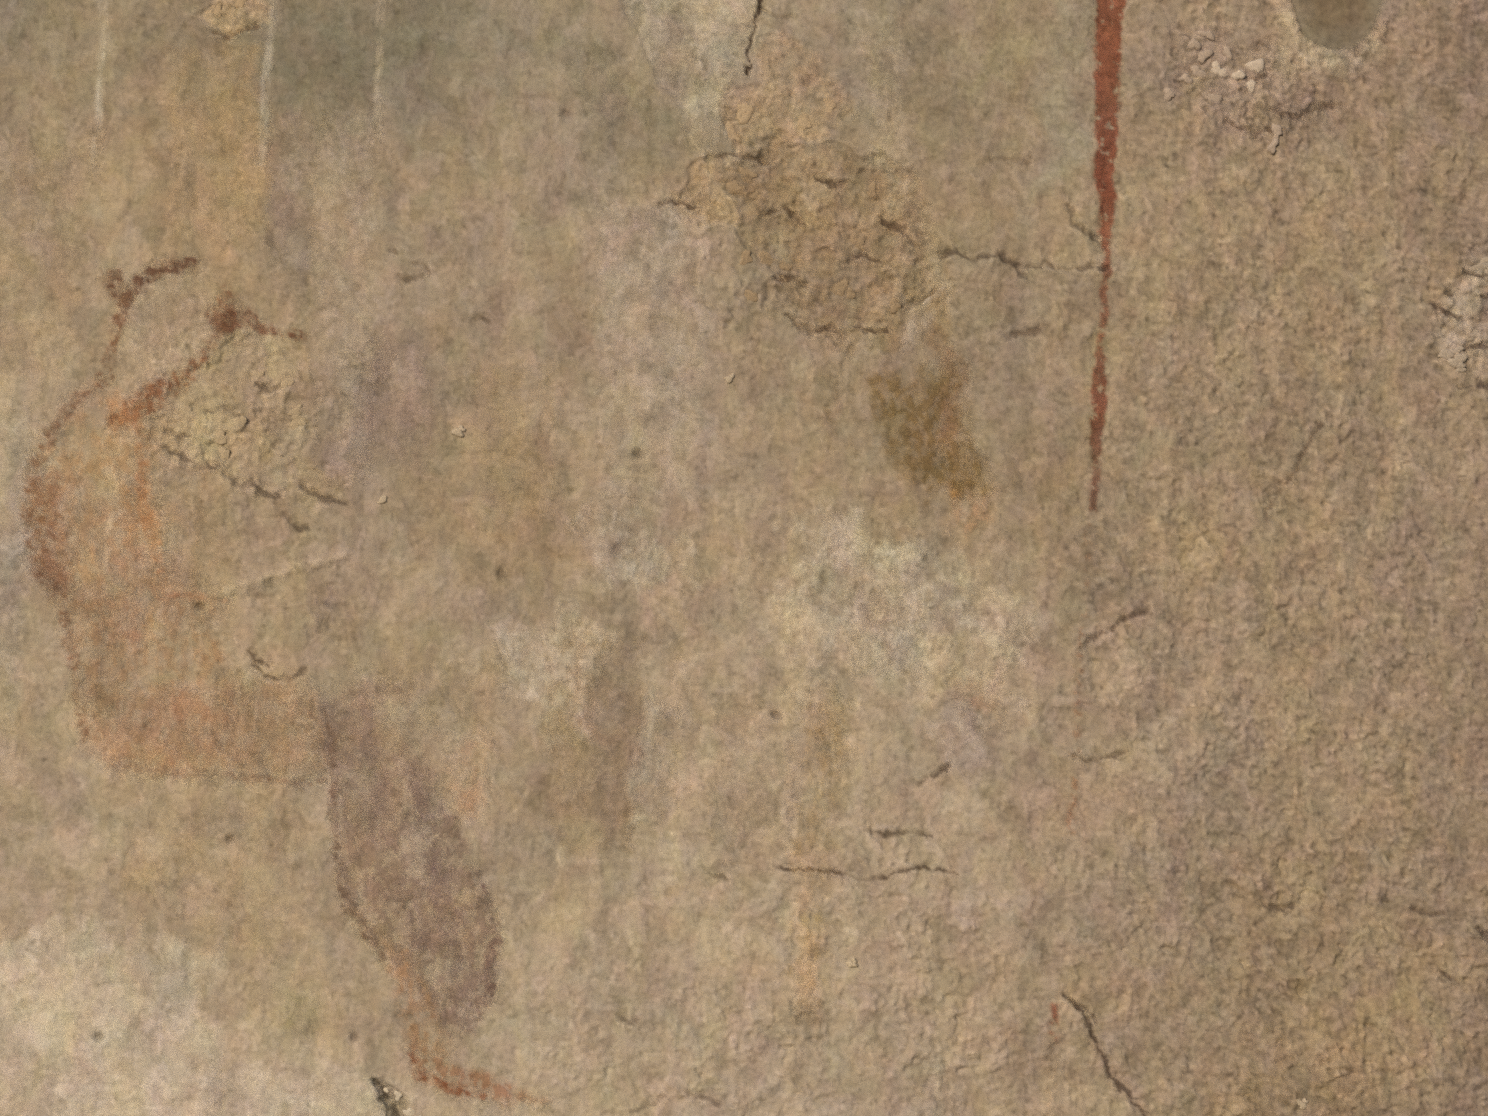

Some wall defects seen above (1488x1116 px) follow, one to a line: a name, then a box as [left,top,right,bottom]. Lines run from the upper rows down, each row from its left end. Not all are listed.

flaking render [205,0,266,36]
crack [745,0,762,75]
flaking render [801,272,946,341]
damp [870,369,983,497]
crack [1062,994,1145,1116]
flaking render [383,1087,422,1116]